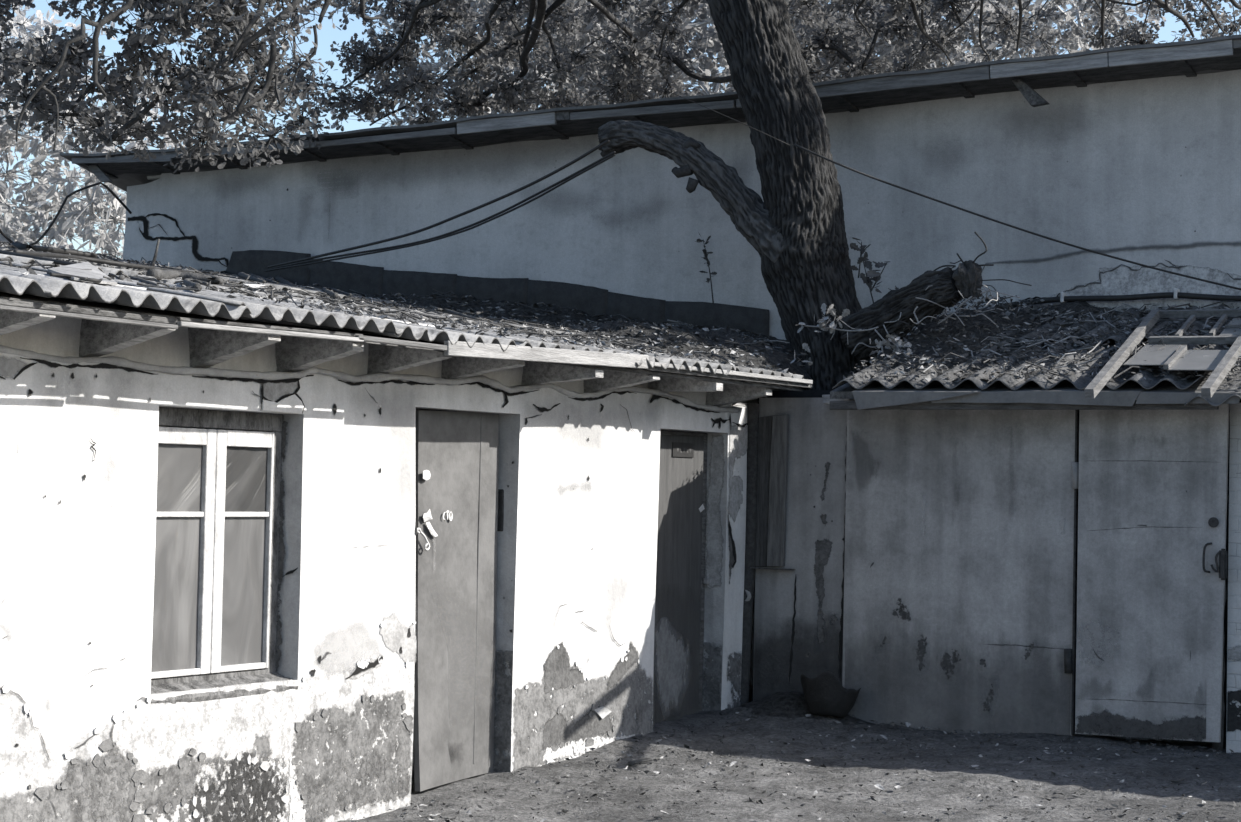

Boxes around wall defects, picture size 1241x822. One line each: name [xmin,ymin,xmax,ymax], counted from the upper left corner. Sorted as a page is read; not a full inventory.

flaking render [1016,265,1241,312]
crack [0,357,155,380]
crack [192,375,748,434]
peeling [820,462,830,524]
flaking render [0,381,417,822]
peeling [814,539,837,647]
crack [553,590,627,676]
peeling [512,642,654,771]
corrosion [1075,710,1206,741]
spalling [1227,689,1241,732]